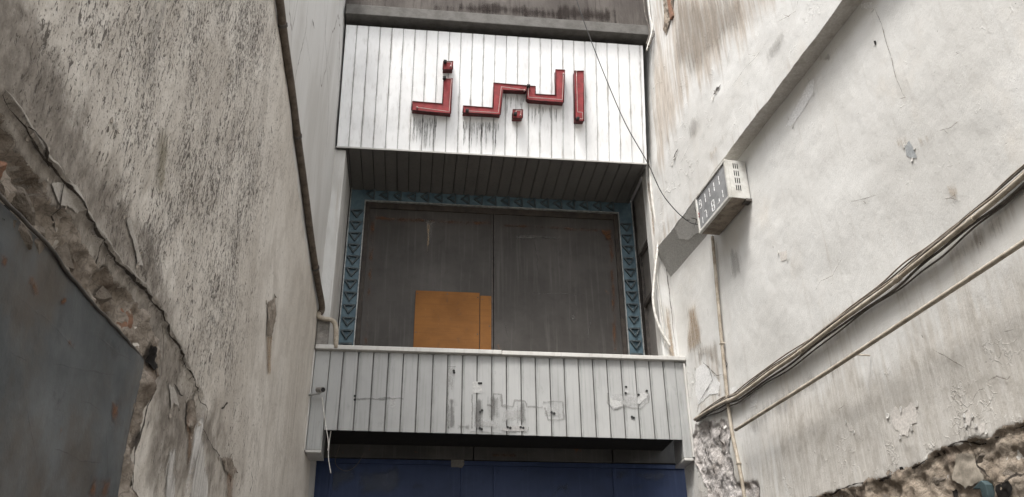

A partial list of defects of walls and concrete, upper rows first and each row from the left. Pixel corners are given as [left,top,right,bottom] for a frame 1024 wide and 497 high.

damp [412,117,437,146]
spalling [0,113,202,497]
flaking render [266,294,277,372]
flaking render [218,453,238,482]
peeling [694,363,737,408]
flaking render [692,418,760,497]
peeling [886,400,918,439]
spalling [816,408,1024,497]